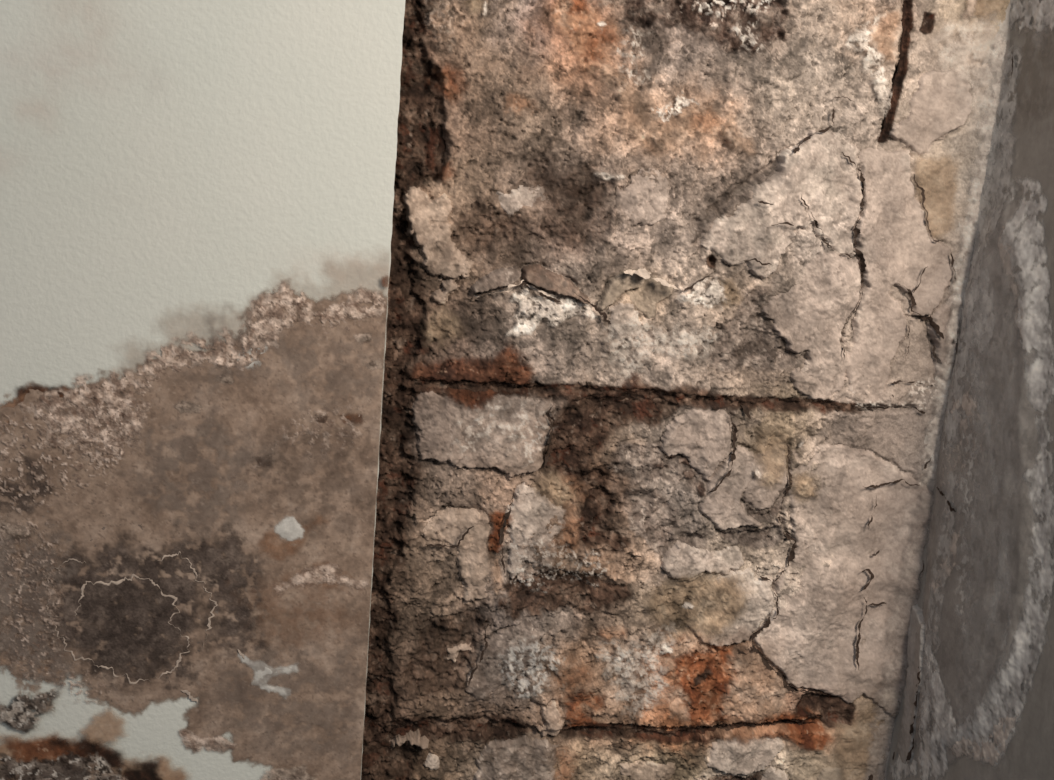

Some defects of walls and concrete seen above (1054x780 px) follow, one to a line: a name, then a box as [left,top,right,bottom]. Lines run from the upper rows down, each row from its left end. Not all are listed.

crack [792,96,852,153]
water stain [0,281,387,780]
corrosion [413,346,533,407]
corrosion [623,373,713,403]
crack [708,405,751,494]
crack [738,441,816,693]
crack [758,152,866,358]
crack [813,174,958,414]
crack [856,459,956,670]
water stain [837,41,1054,780]
corrosion [554,657,613,737]
corrosion [632,631,832,750]